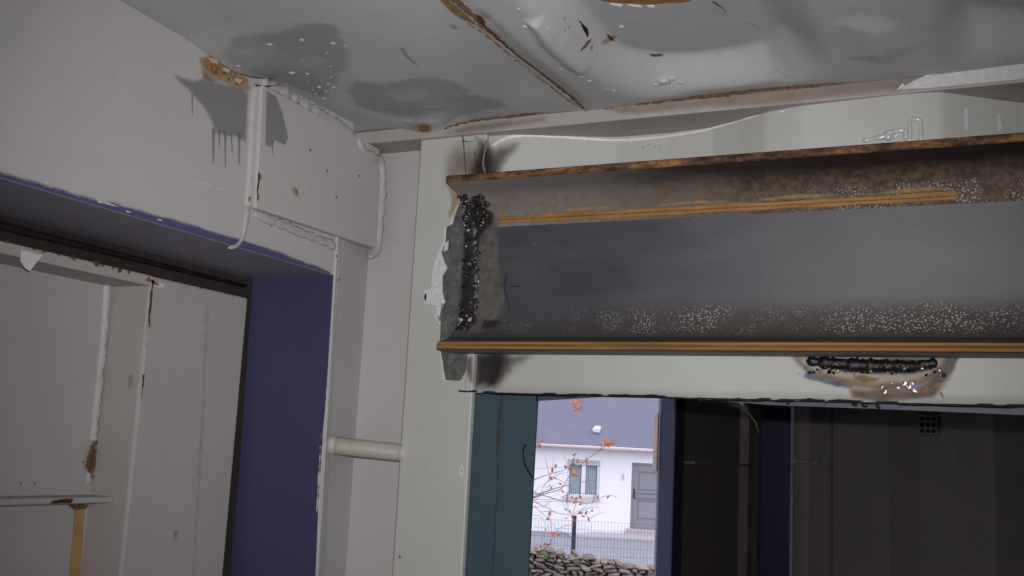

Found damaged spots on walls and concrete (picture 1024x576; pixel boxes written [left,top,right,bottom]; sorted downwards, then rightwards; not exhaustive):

rust [441,0,843,111]
rust [498,188,958,223]
rust [146,277,165,344]
rust [83,441,97,477]